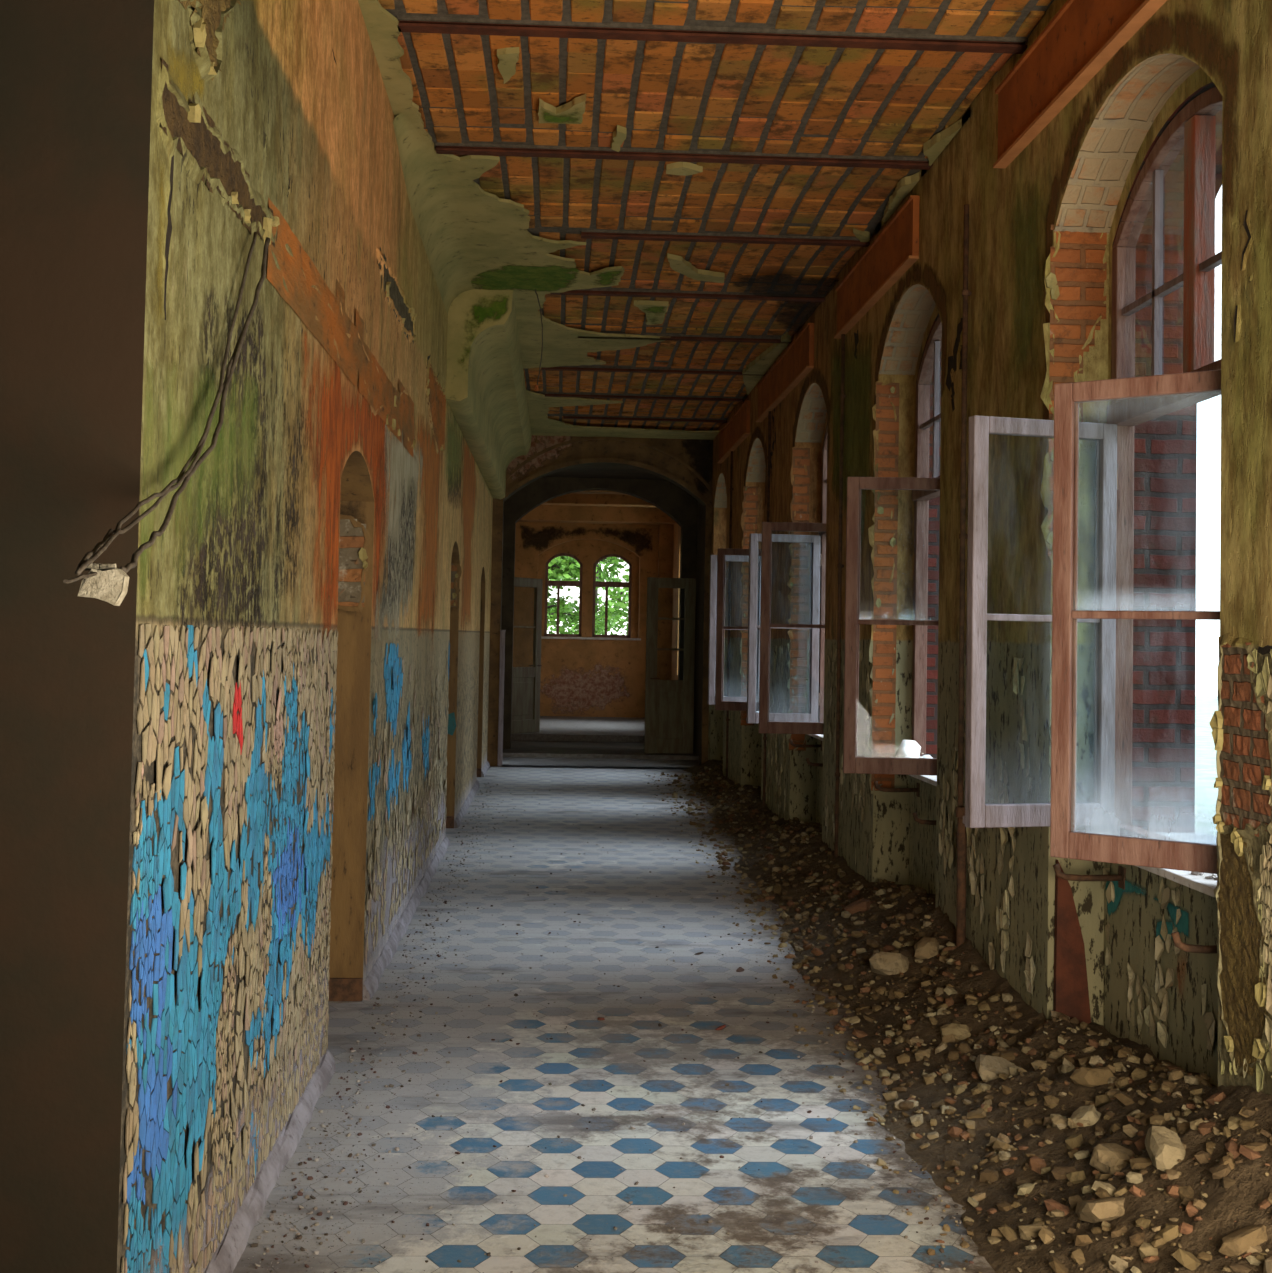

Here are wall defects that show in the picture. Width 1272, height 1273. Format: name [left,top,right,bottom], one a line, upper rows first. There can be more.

spalling [156,0,446,457]
spalling [376,0,1054,479]
water stain [178,292,306,647]
spalling [338,514,372,613]
water stain [375,425,423,639]
peeling [121,624,338,1273]
peeling [365,643,450,965]
flaking render [786,649,898,839]
flaking render [939,746,1016,972]
flaking render [1024,931,1036,994]
flaking render [1102,868,1189,1048]
spalling [1201,632,1272,1092]